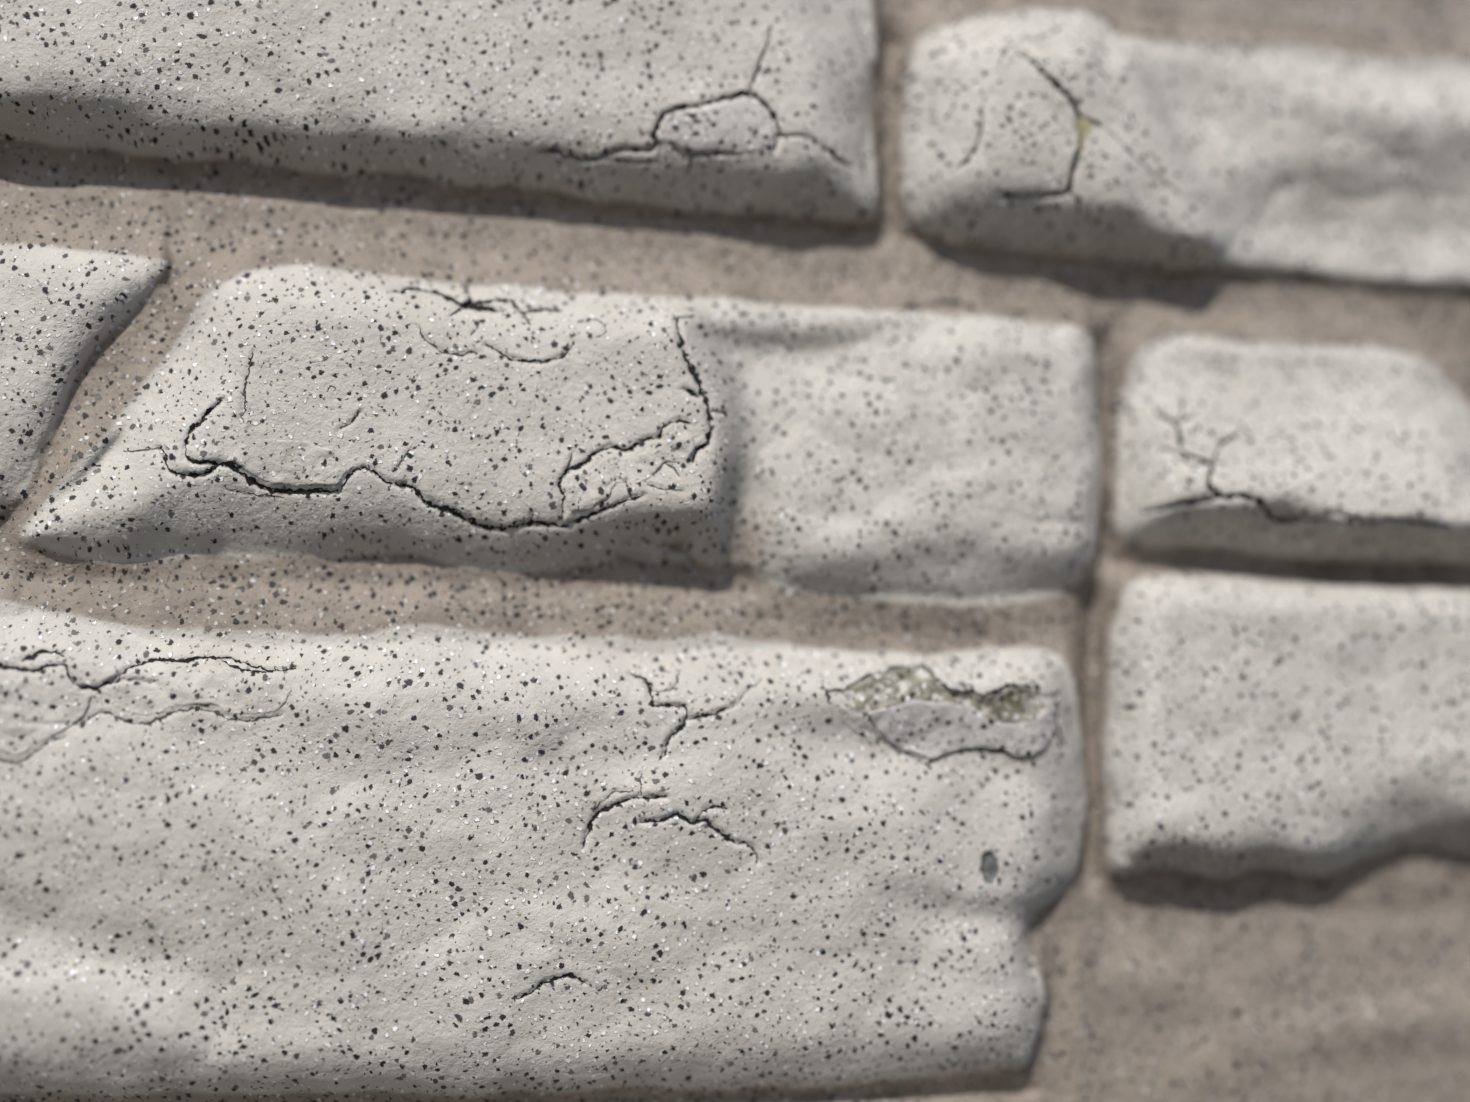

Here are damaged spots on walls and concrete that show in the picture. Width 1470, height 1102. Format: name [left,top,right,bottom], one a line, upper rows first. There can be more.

crack [538,31,852,173]
crack [958,109,983,169]
crack [999,26,1178,213]
crack [392,286,607,363]
crack [123,315,725,532]
crack [1144,397,1445,527]
crack [582,673,762,863]
spalling [822,659,1055,765]